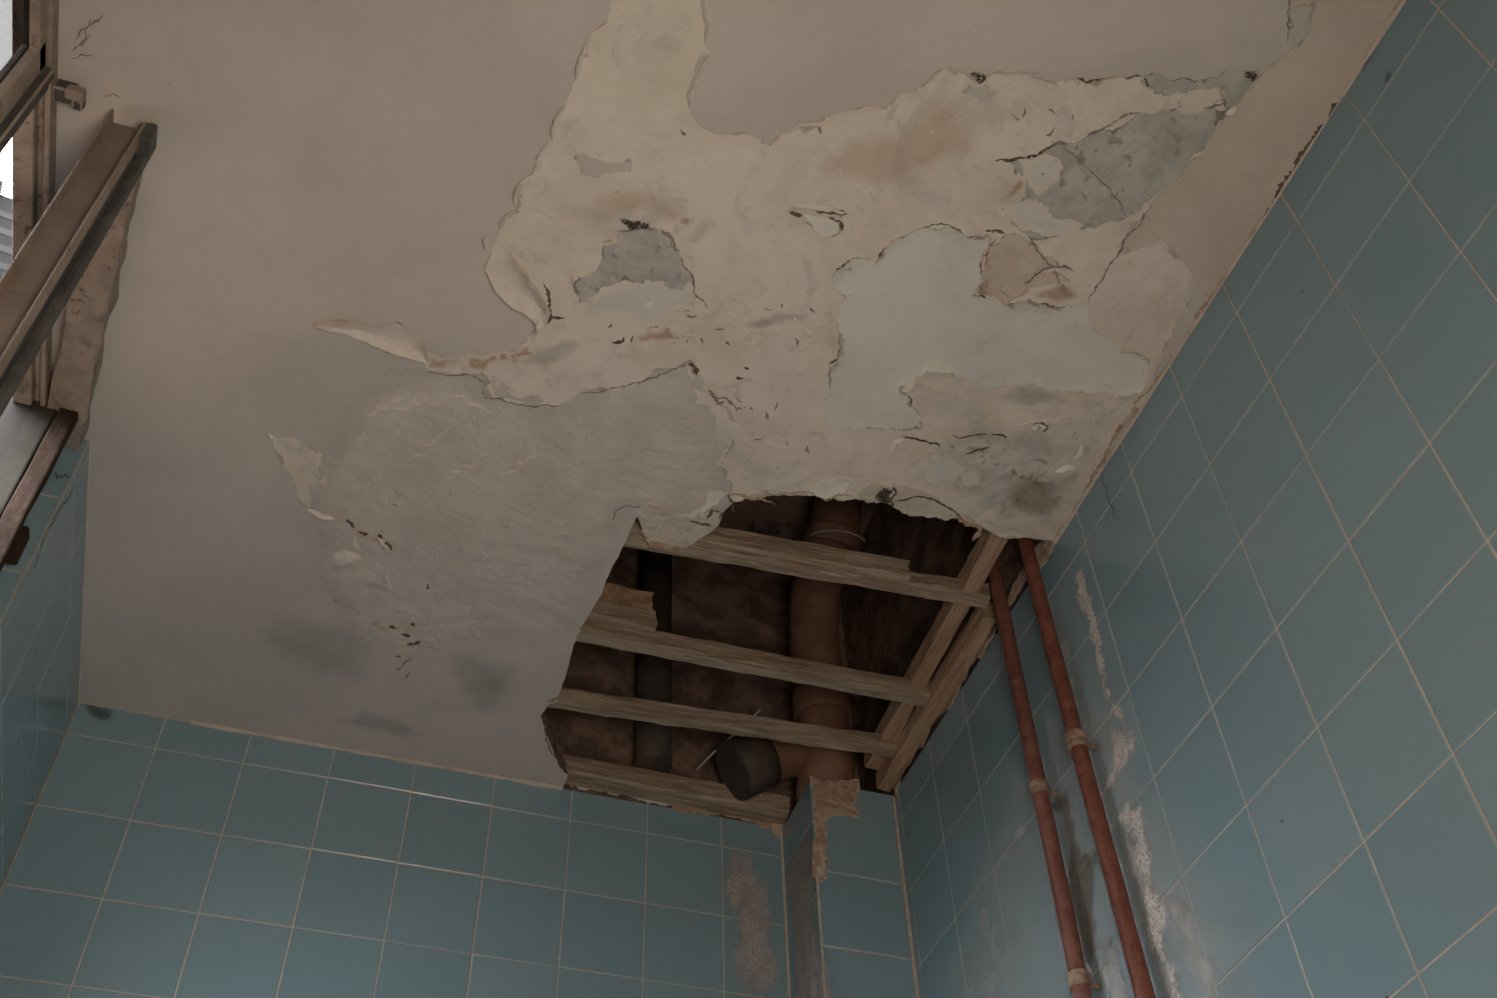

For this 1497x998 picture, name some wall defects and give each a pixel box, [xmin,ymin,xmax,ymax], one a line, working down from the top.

peeling [427,0,1260,607]
peeling [267,433,394,591]
spalling [540,700,786,839]
damp [720,831,832,998]
corrosion [1052,796,1094,959]